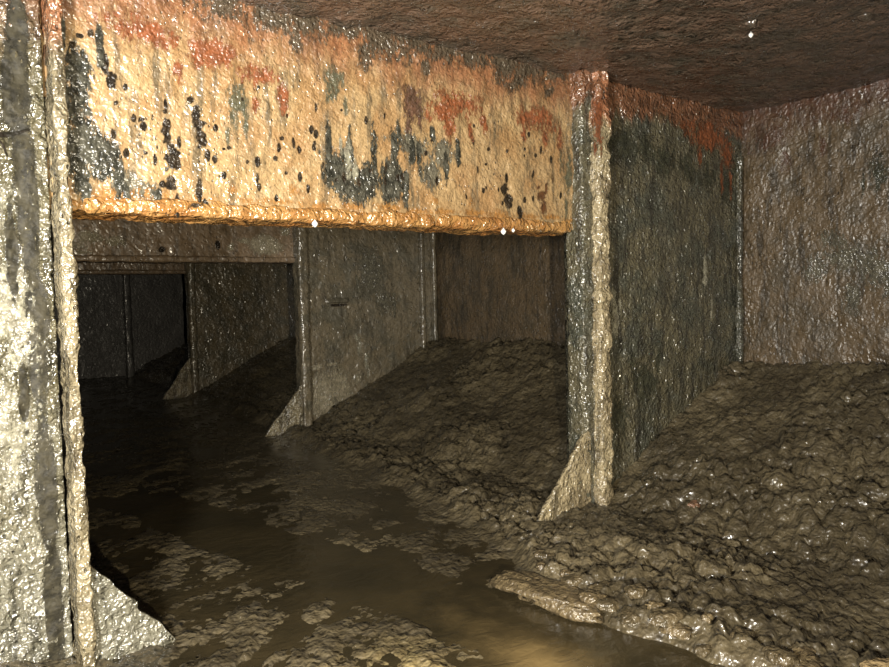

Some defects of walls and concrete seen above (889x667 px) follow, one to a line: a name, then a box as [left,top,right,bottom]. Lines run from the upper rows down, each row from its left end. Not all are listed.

corrosion [93,11,289,116]
water stain [288,29,303,54]
water stain [358,41,375,72]
water stain [61,18,162,202]
water stain [225,83,249,145]
water stain [318,65,461,211]
corrosion [402,84,488,142]
corrosion [513,105,562,152]
corrosion [590,98,604,158]
corrosion [523,175,559,220]
water stain [698,252,713,318]
water stain [611,340,661,437]